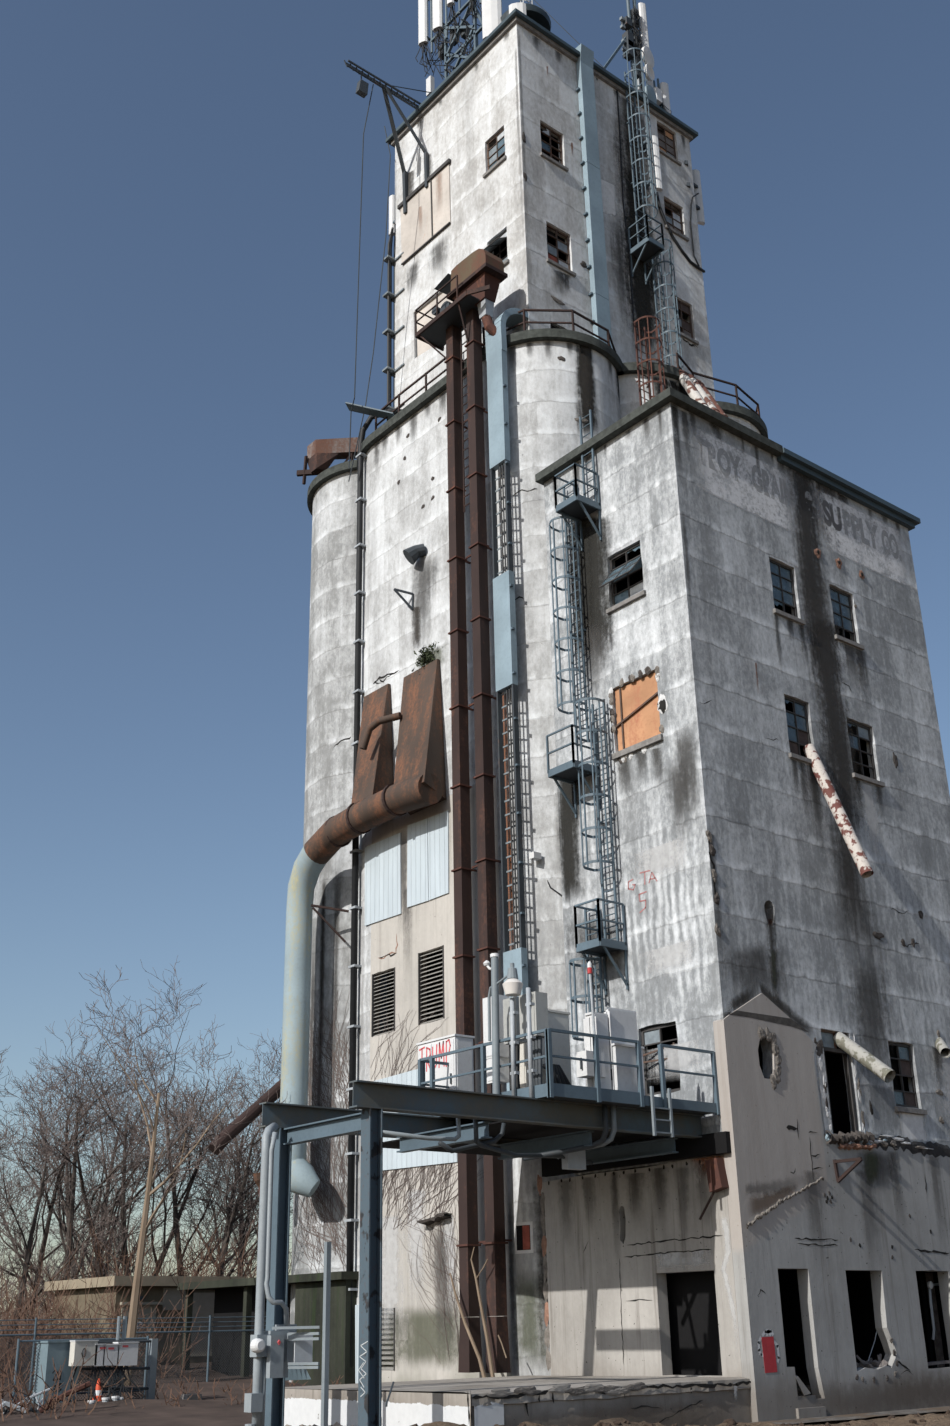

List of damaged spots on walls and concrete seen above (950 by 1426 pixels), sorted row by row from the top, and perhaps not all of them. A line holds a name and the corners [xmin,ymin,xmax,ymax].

leakage [615,92,657,346]
leakage [509,341,550,360]
leakage [567,343,620,432]
leakage [742,439,881,943]
spalling [758,1026,782,1090]
leakage [857,977,887,1056]